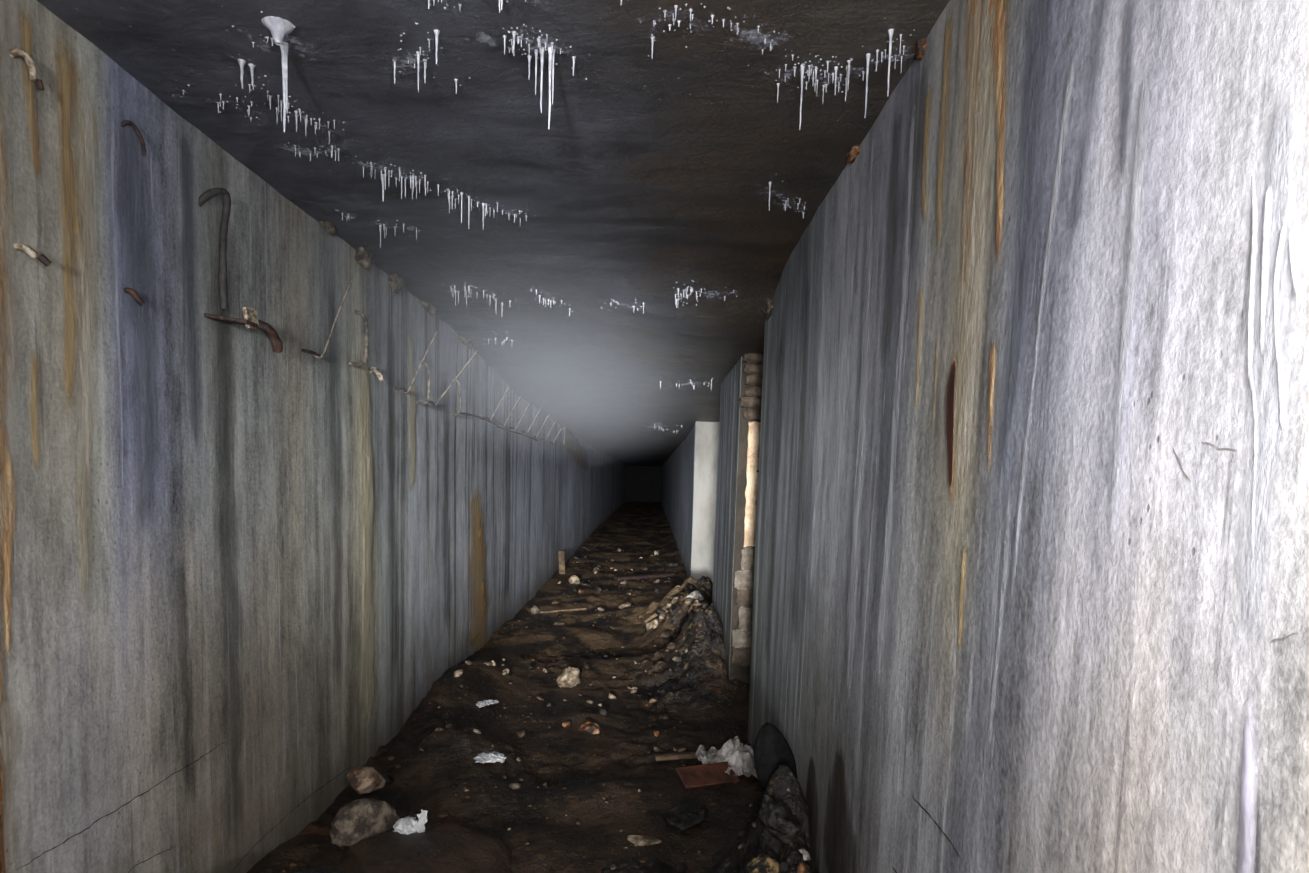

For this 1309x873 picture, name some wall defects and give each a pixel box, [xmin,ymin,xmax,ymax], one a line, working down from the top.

corrosion [22,18,40,174]
damp [176,11,536,227]
damp [640,3,915,130]
corrosion [922,24,951,241]
corrosion [57,51,98,589]
damp [374,220,420,248]
damp [450,283,578,316]
damp [673,280,737,308]
corrosion [954,0,1006,484]
corrosion [0,403,16,701]
crack [16,742,225,870]